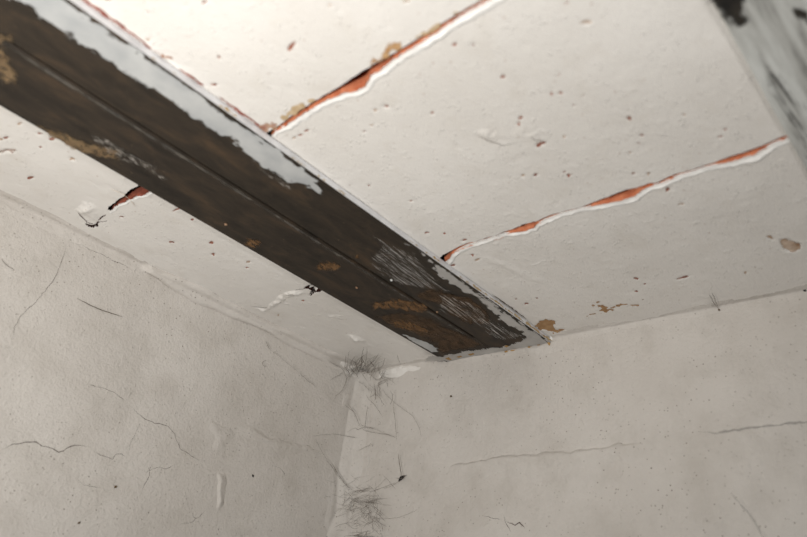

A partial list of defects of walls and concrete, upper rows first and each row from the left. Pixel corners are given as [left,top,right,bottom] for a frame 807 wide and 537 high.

peeling [712,0,748,27]
peeling [792,8,807,23]
peeling [767,235,800,252]
peeling [403,334,438,352]
crack [137,414,199,490]